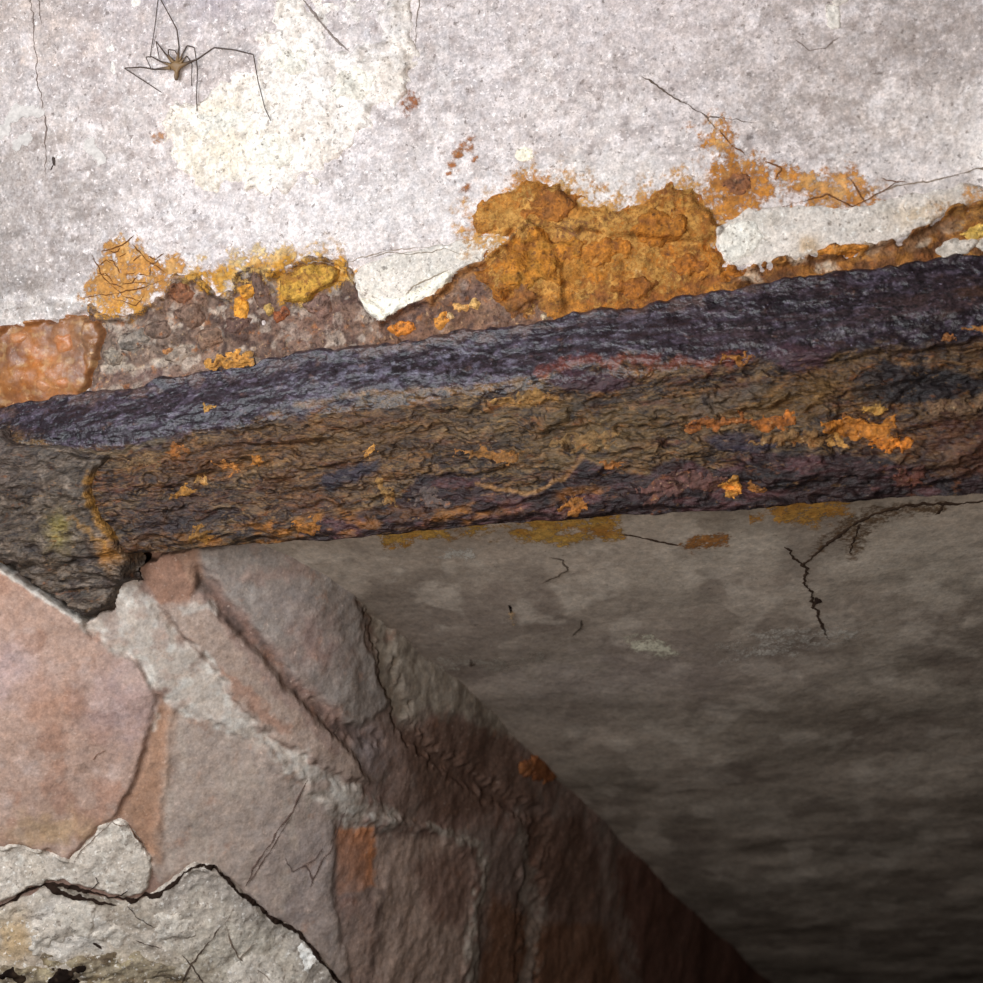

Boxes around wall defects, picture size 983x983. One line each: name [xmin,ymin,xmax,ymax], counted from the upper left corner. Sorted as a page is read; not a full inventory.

corrosion [77,232,357,323]
spalling [162,0,420,196]
spalling [87,230,553,391]
corrosion [446,138,478,175]
corrosion [687,114,905,226]
peeling [715,182,983,267]
corrosion [76,325,983,554]
crack [784,500,983,640]